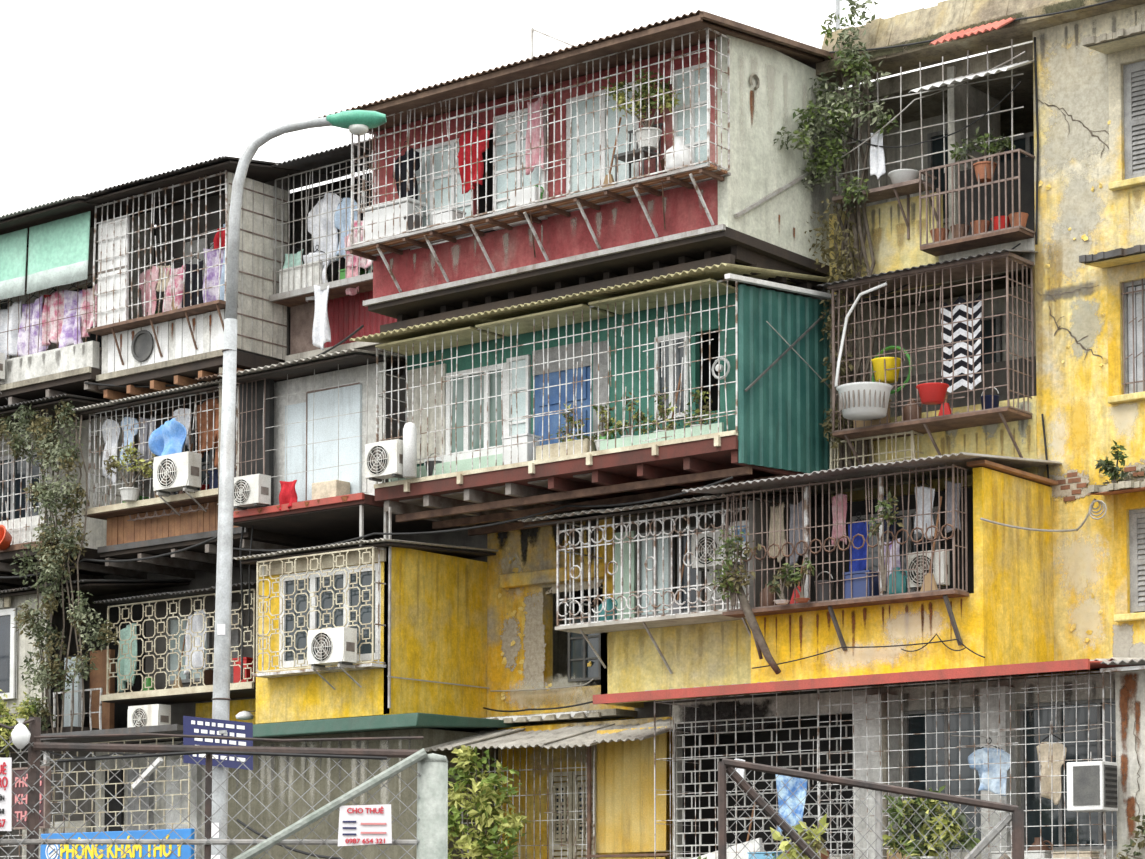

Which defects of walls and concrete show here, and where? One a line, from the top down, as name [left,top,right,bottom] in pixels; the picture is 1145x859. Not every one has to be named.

crack [1039,100,1109,155]
crack [1037,285,1103,360]
spalling [1044,455,1109,504]
spalling [1124,458,1145,480]
spalling [486,579,605,723]
rust [1119,673,1140,837]